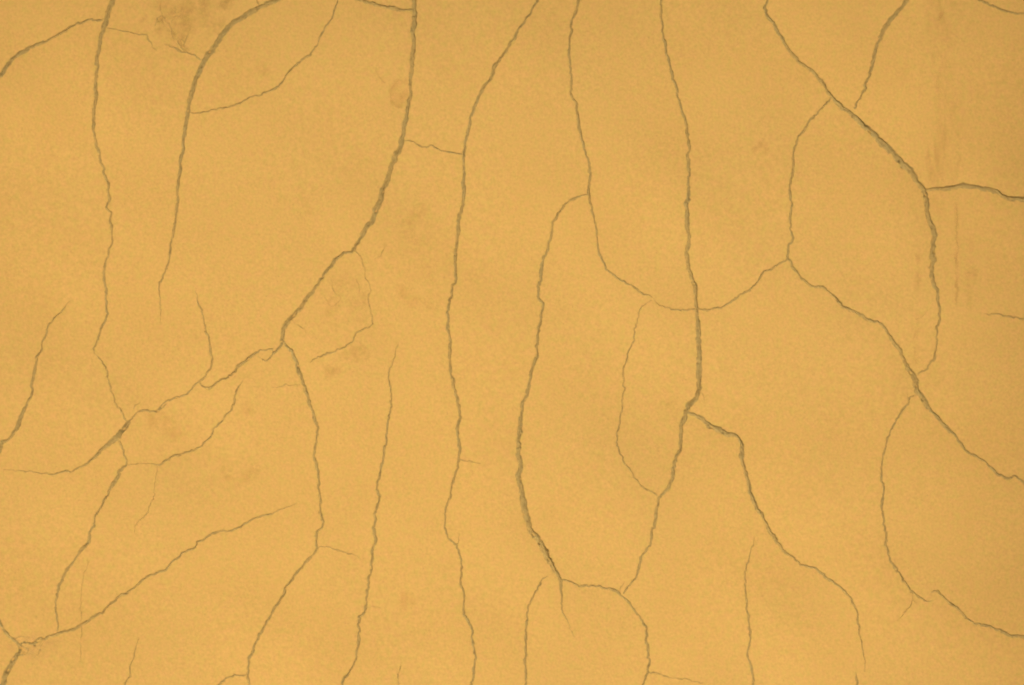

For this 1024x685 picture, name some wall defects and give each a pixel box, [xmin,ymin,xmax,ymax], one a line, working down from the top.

crack [0,0,539,685]
crack [515,0,1024,685]